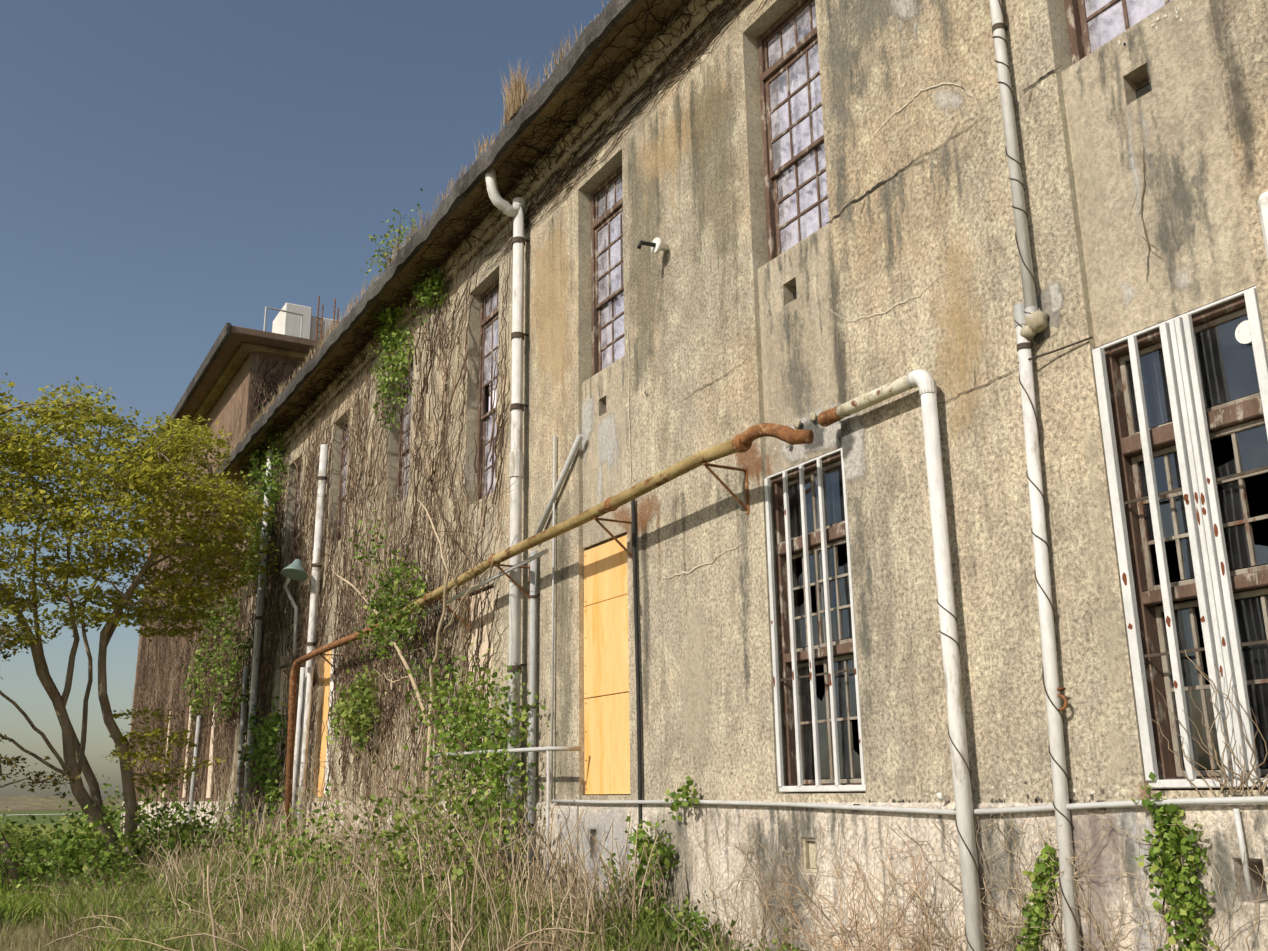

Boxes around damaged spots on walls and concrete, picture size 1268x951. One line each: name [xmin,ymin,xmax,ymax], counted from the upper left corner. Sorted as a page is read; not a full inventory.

leakage [827,0,917,225]
crack [826,82,982,224]
crack [1130,146,1159,281]
leakage [1209,0,1252,145]
leakage [748,810,815,951]
leakage [975,815,1018,901]
leakage [1122,814,1157,888]
leakage [1206,838,1237,909]